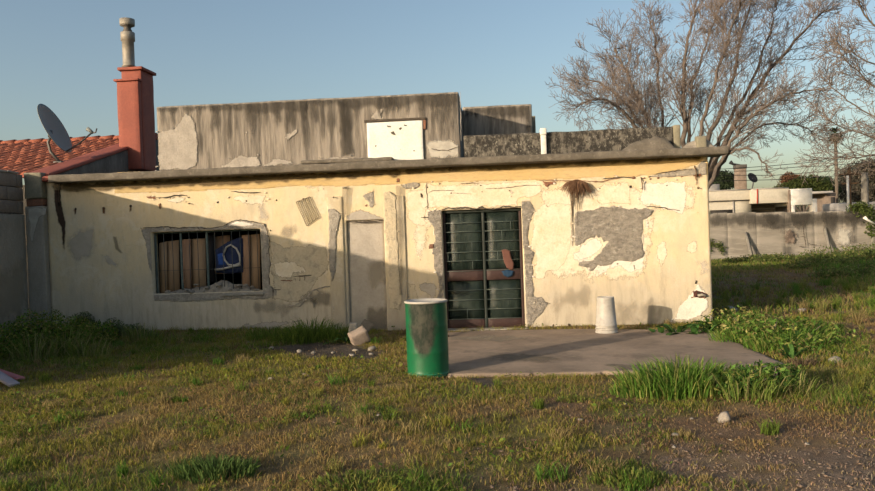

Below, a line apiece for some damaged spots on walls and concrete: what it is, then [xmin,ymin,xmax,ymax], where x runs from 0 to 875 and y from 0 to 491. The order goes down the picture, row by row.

damp [157,93,457,155]
peeling [271,262,305,280]
damp [29,140,700,245]
flaking render [324,160,708,327]